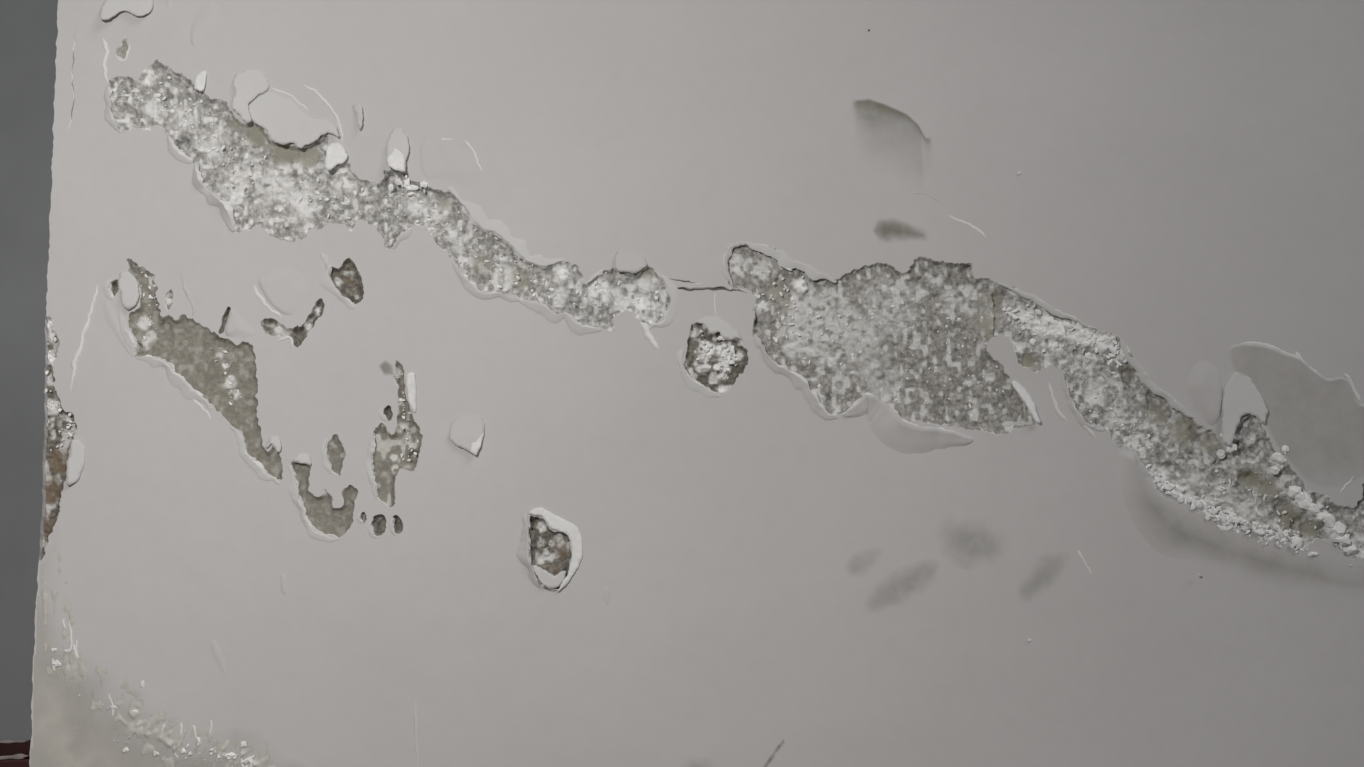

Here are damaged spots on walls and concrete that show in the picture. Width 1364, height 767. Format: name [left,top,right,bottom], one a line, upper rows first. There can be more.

flaking render [104,39,678,350]
flaking render [40,317,85,561]
damp [31,543,277,767]
flaking render [103,258,423,542]
peeling [449,414,485,455]
flaking render [516,507,583,592]
flaking render [677,242,1364,566]